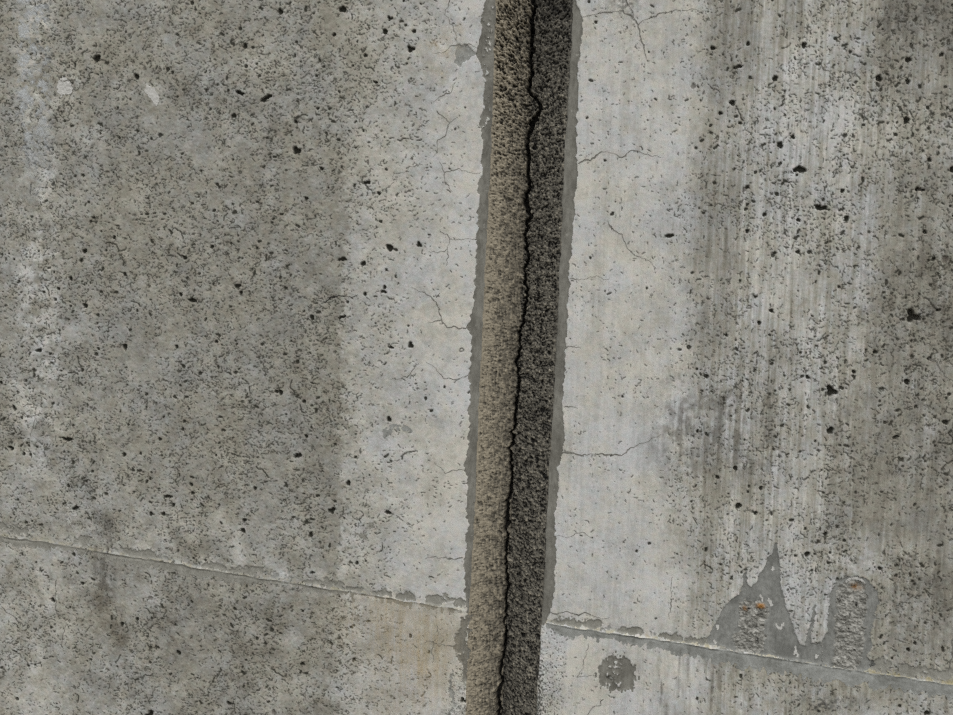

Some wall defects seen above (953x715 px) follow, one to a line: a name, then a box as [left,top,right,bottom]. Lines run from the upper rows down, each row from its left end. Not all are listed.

crack [382,88,471,190]
crack [411,287,471,329]
peeling [542,0,953,700]